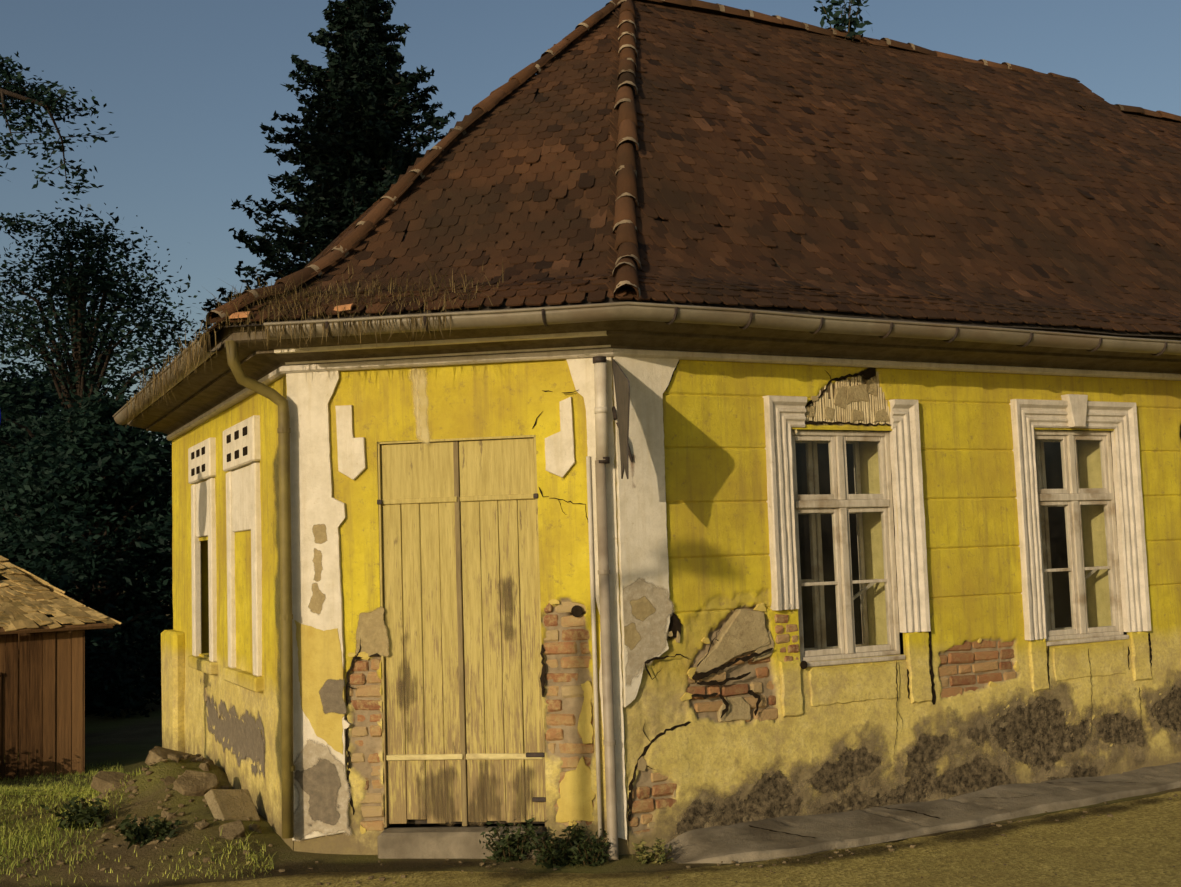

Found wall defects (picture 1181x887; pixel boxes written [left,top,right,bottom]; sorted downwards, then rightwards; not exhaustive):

spalling [795,368,890,433]
peeling [294,524,389,834]
flaking render [544,599,595,829]
flaking render [627,756,677,841]
peeling [623,578,682,684]
crack [627,721,691,821]
flaking render [680,603,808,722]
leakage [670,673,1181,841]
flaking render [938,638,1019,698]